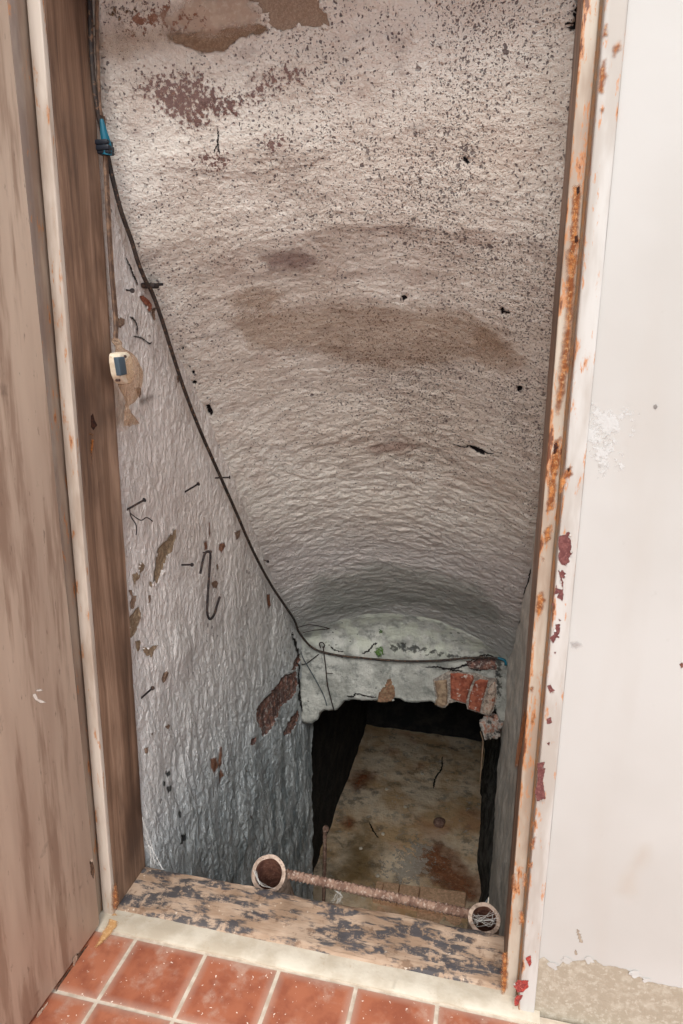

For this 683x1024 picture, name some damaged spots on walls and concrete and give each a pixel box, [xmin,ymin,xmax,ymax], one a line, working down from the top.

flaking render [106,0,330,53]
peeling [129,61,307,174]
rust [556,186,580,410]
rust [547,439,572,511]
flaking render [129,529,176,658]
rust [536,594,545,614]
flaking render [251,654,301,745]
flaking render [433,659,498,716]
leakage [341,834,445,885]
rust [420,844,480,901]
flaking render [513,955,683,1024]